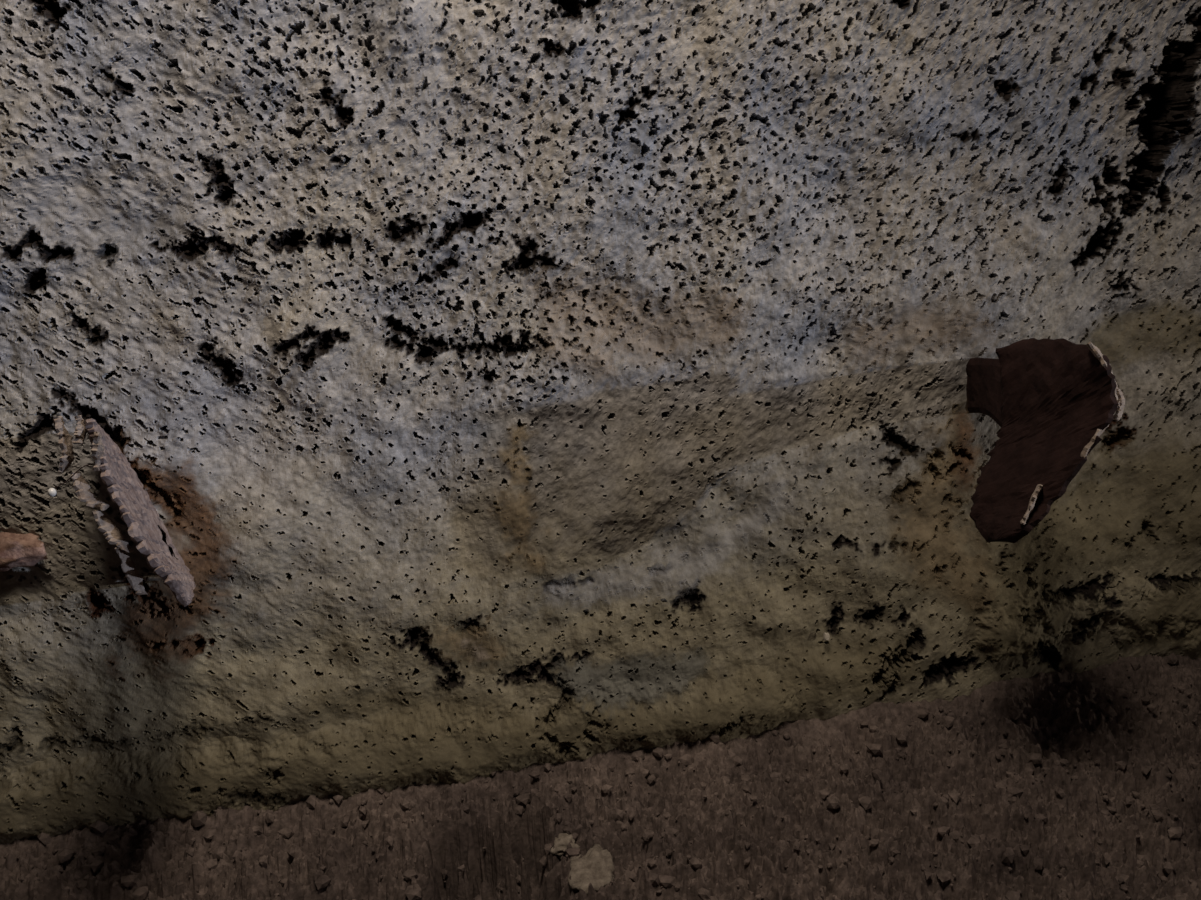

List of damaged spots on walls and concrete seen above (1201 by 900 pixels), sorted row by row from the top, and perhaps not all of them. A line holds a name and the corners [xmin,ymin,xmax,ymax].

rust [52,415,231,661]